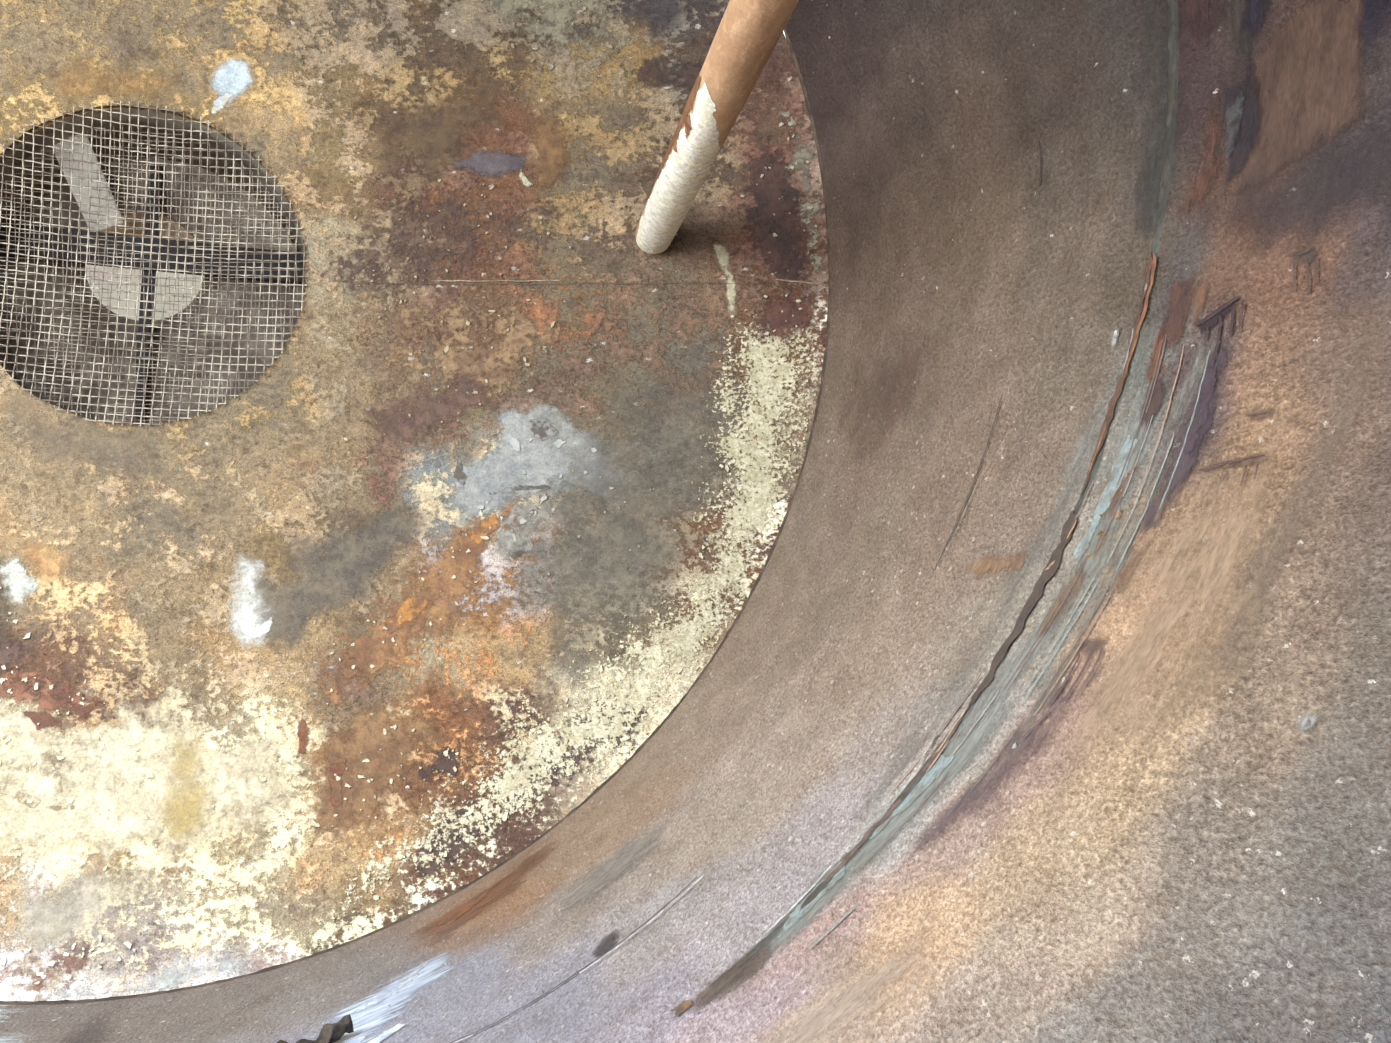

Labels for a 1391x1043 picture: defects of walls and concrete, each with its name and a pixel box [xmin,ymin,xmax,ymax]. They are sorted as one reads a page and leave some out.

rust [313,179,572,401]
rust [1141,277,1207,425]
rust [25,544,62,577]
rust [0,612,105,730]
rust [296,504,520,842]
peeling [291,244,822,946]
rust [1039,466,1137,634]
peeling [0,690,293,898]
rust [0,935,136,991]
spalling [593,932,616,956]